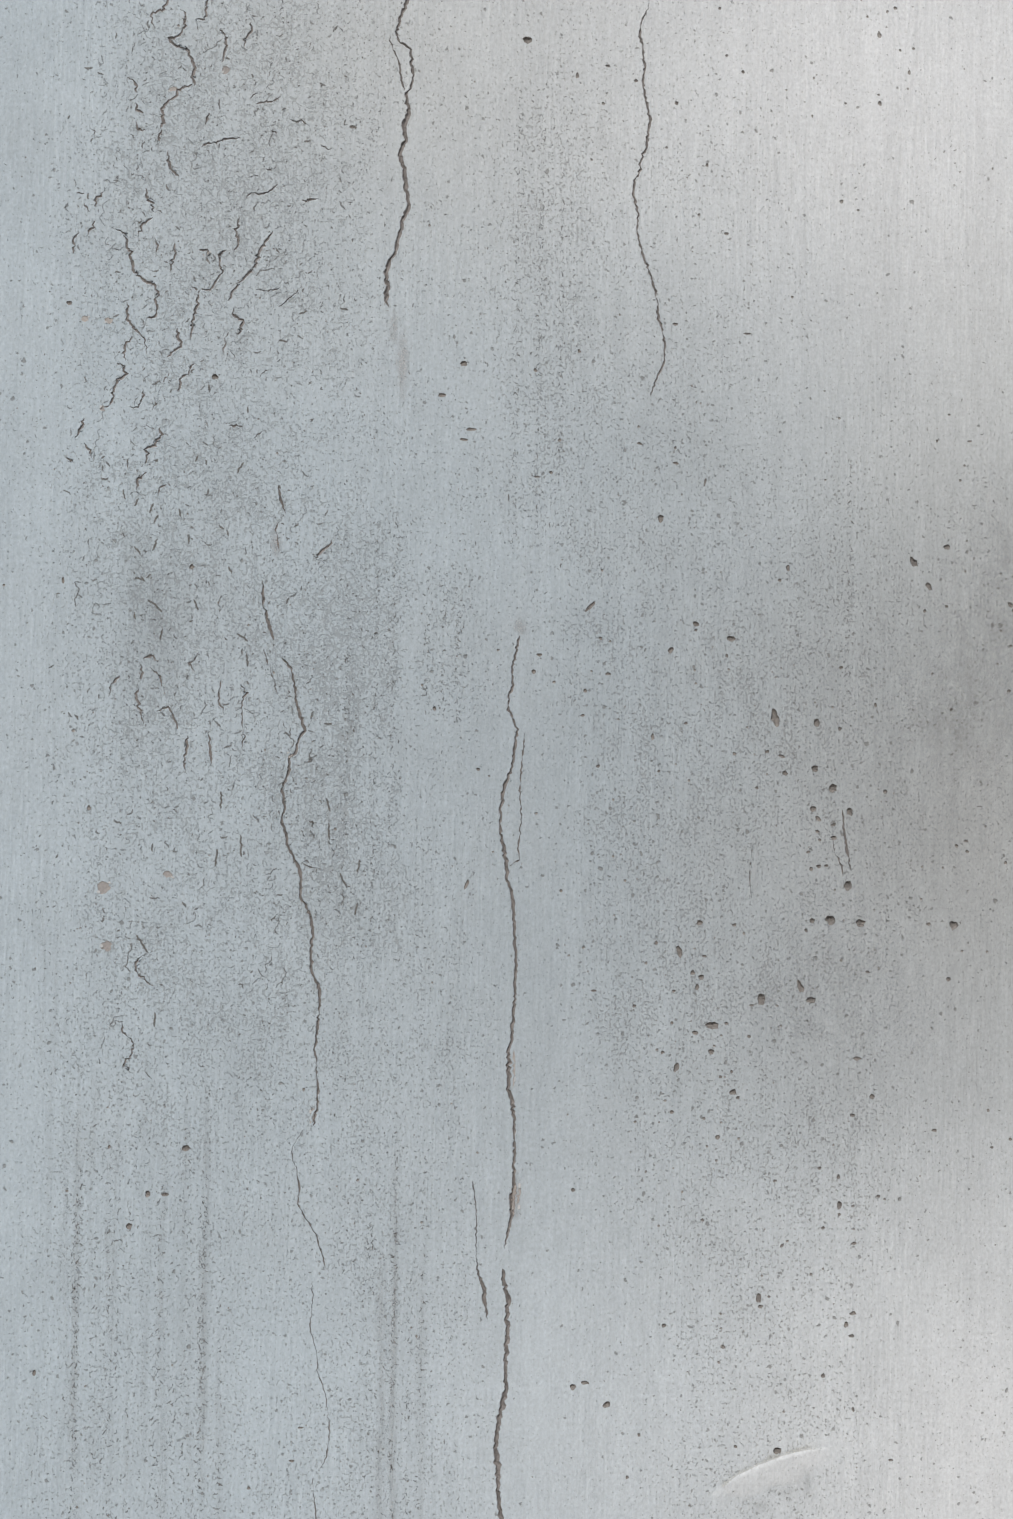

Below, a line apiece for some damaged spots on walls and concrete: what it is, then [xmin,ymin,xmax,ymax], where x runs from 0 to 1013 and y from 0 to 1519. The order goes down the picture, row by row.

crack [5,0,762,1519]